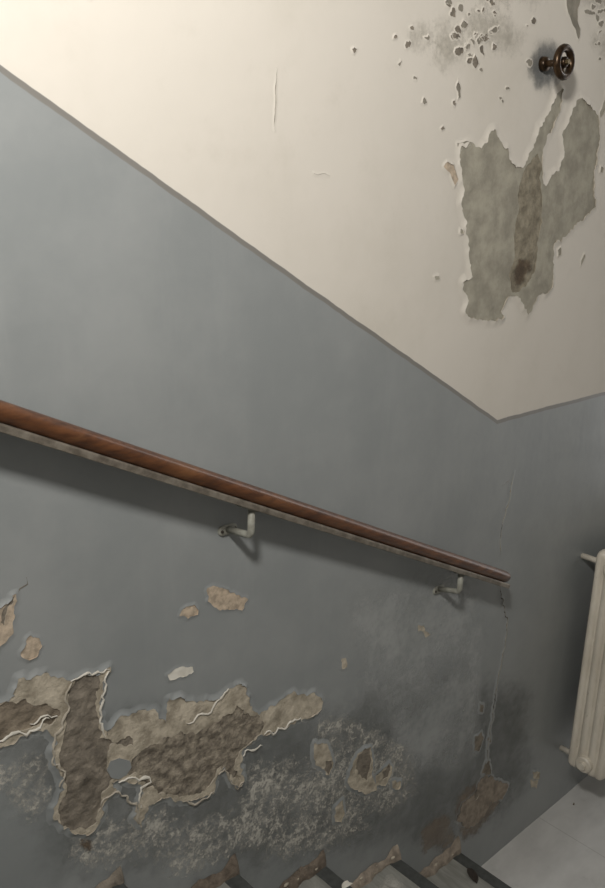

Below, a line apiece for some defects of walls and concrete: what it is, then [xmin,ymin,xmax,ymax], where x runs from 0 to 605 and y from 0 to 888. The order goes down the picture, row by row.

peeling [564,0,582,43]
peeling [441,81,605,329]
spalling [0,577,325,840]
leakage [71,673,474,876]
spalling [310,738,336,779]
spalling [331,743,403,826]
peeling [191,854,240,888]
peeling [279,849,326,888]
peeling [342,845,402,888]